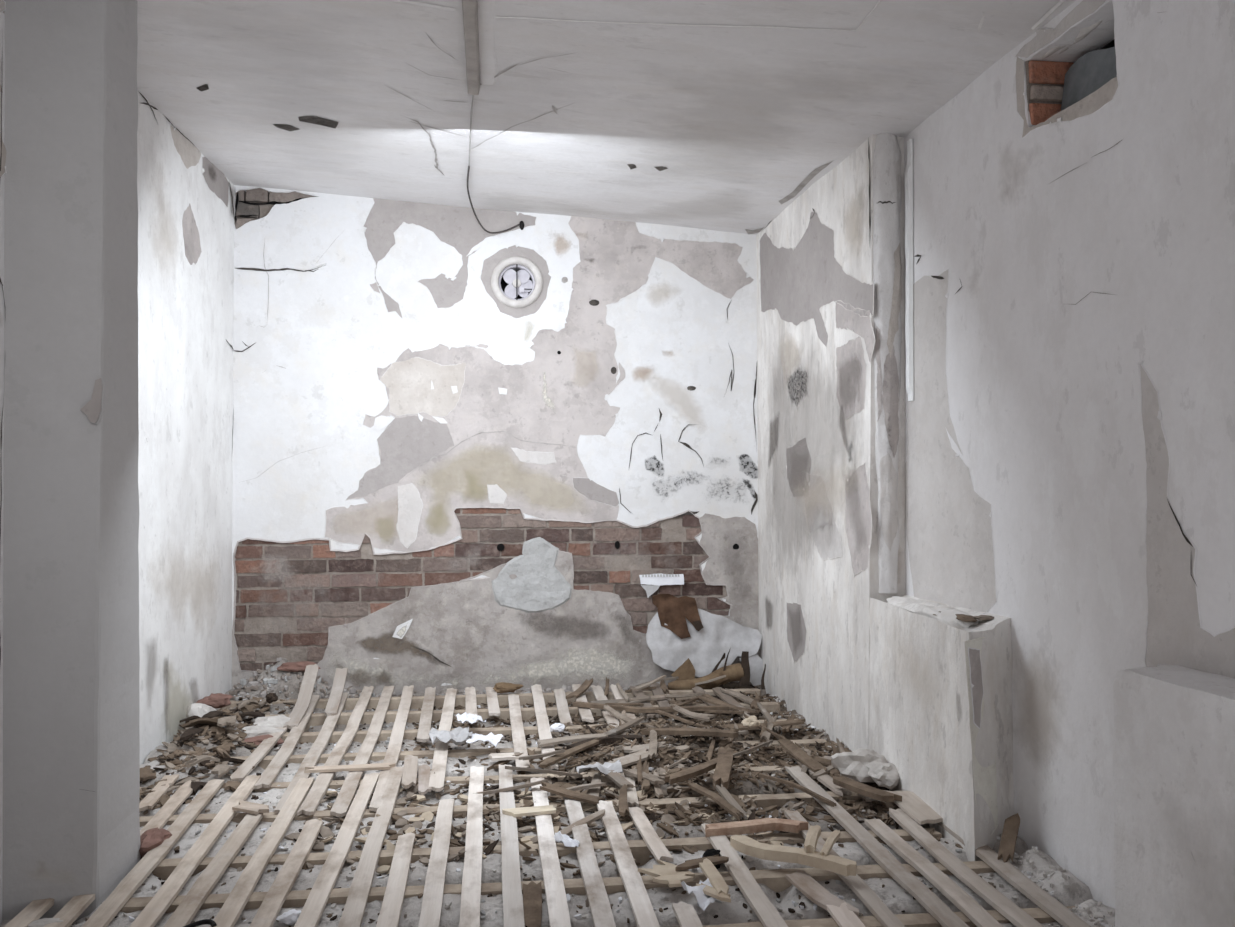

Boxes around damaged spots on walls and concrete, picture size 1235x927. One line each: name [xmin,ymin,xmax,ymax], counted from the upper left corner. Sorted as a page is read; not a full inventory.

flaking render [1015,0,1120,139]
crack [0,90,8,171]
flaking render [169,122,319,231]
peeling [182,202,202,266]
crack [226,182,338,372]
crack [0,482,8,537]
peeling [232,198,875,694]
crack [619,409,704,513]
crack [673,510,699,518]
leakage [717,454,757,498]
peeling [1137,361,1235,679]